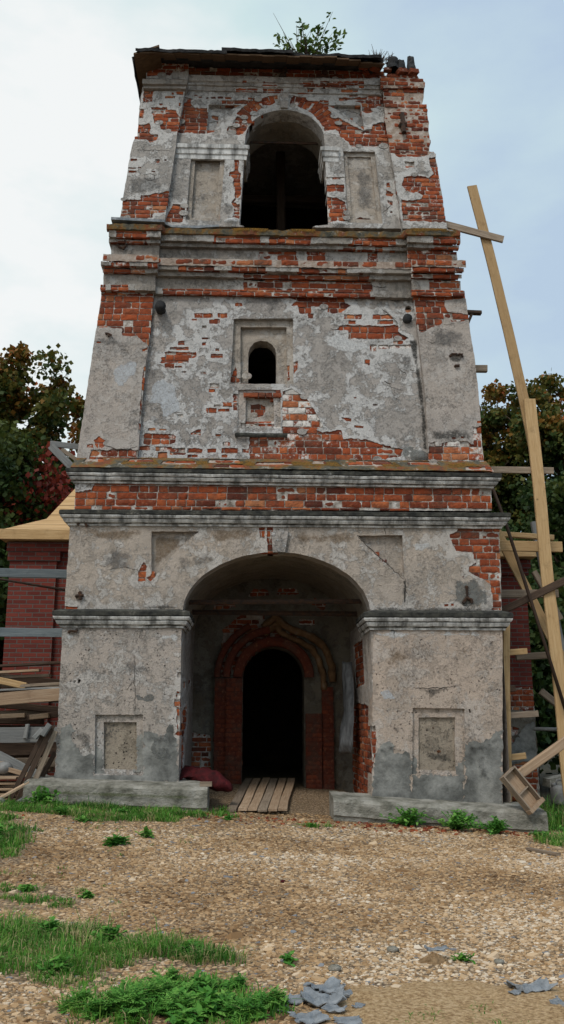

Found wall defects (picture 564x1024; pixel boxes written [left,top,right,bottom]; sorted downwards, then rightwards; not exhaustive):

flaking render [135,63,446,223]
flaking render [121,191,189,223]
flaking render [97,231,469,373]
flaking render [87,361,492,473]
flaking render [74,484,492,512]
crack [357,535,407,603]
flaking render [450,529,502,611]
flaking render [354,636,365,688]
flaking render [352,703,377,793]